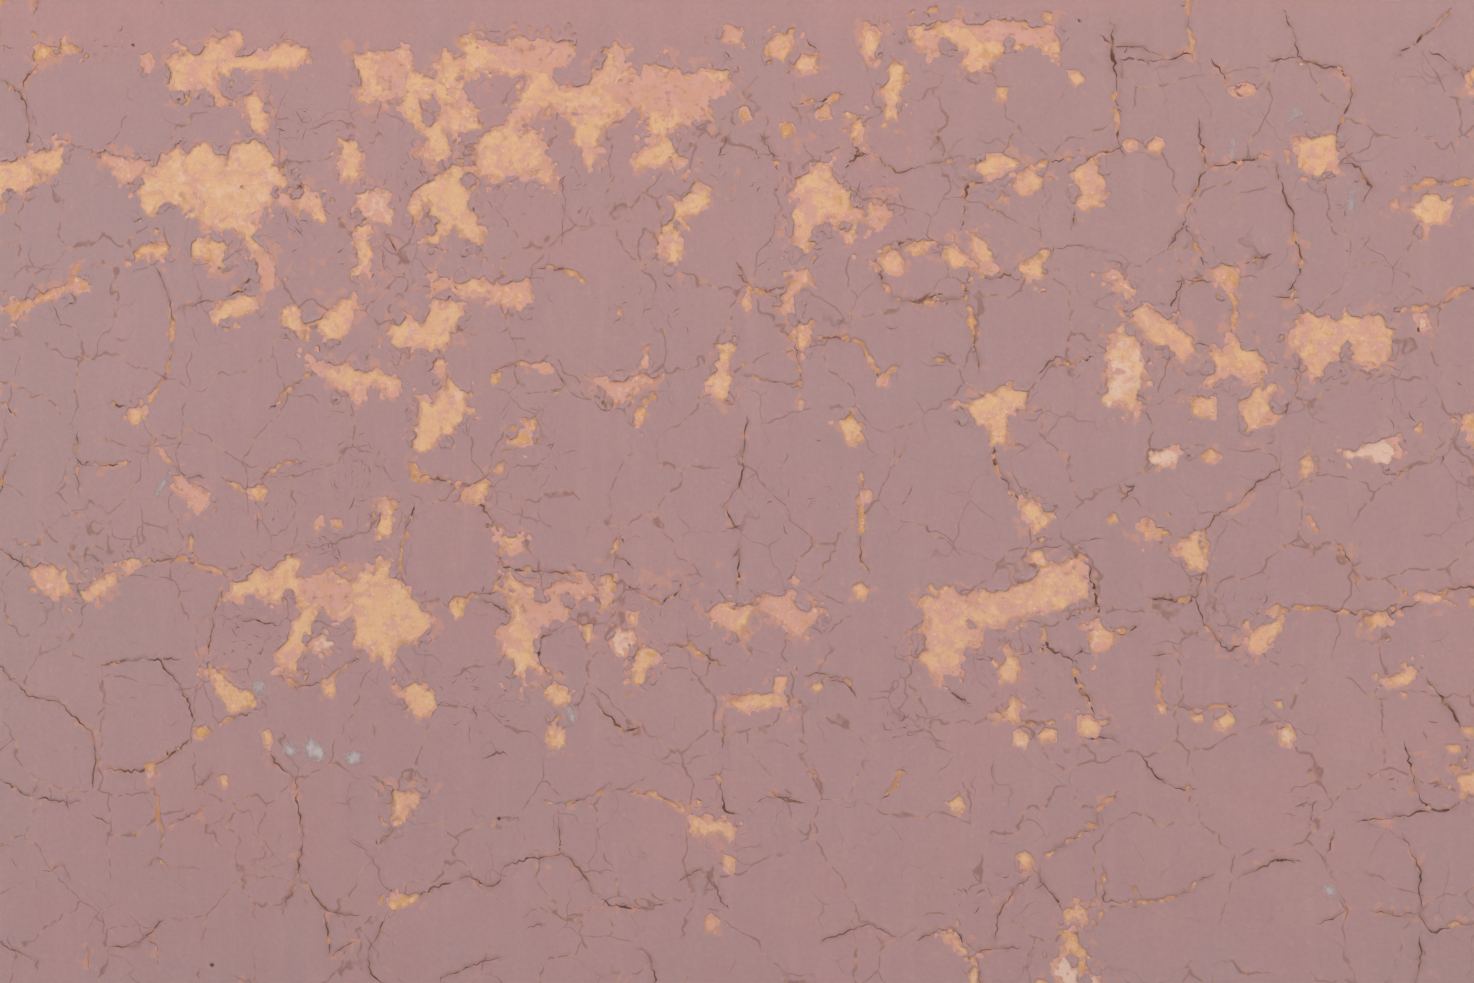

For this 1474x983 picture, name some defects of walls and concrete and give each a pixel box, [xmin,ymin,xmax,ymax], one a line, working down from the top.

peeling [0,23,819,485]
peeling [741,152,1059,360]
crack [735,131,1111,388]
crack [1167,118,1305,347]
peeling [1090,259,1399,438]
crack [0,531,280,869]
peeling [223,492,470,719]
crack [270,751,729,983]
peeling [454,468,669,754]
peeling [908,487,1114,750]
crack [1019,538,1240,791]
crack [820,676,1471,979]